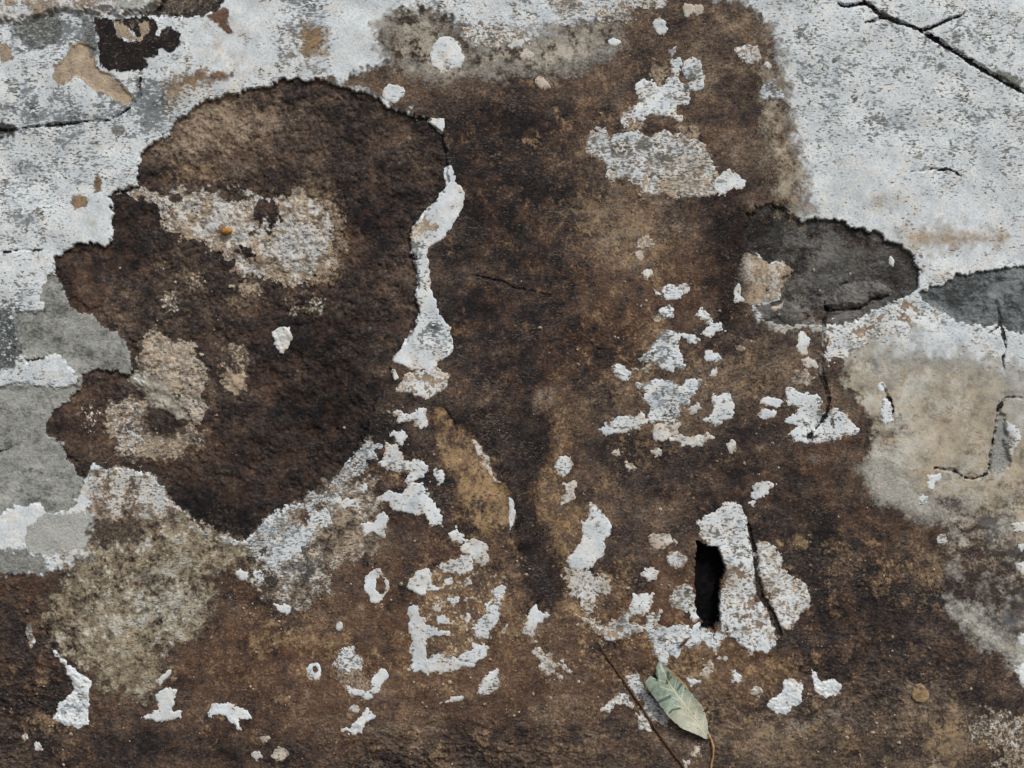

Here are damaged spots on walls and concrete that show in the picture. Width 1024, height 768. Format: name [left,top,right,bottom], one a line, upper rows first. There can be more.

leakage [376,4,487,76]
leakage [427,19,607,84]
crack [837,0,1024,94]
peeling [598,232,737,458]
crack [807,281,887,439]
spalling [734,202,1024,444]
leakage [524,428,557,531]
leakage [838,343,1024,669]
crack [933,396,1015,480]
peeling [522,604,573,682]
peeling [560,481,842,715]
crack [747,523,783,635]